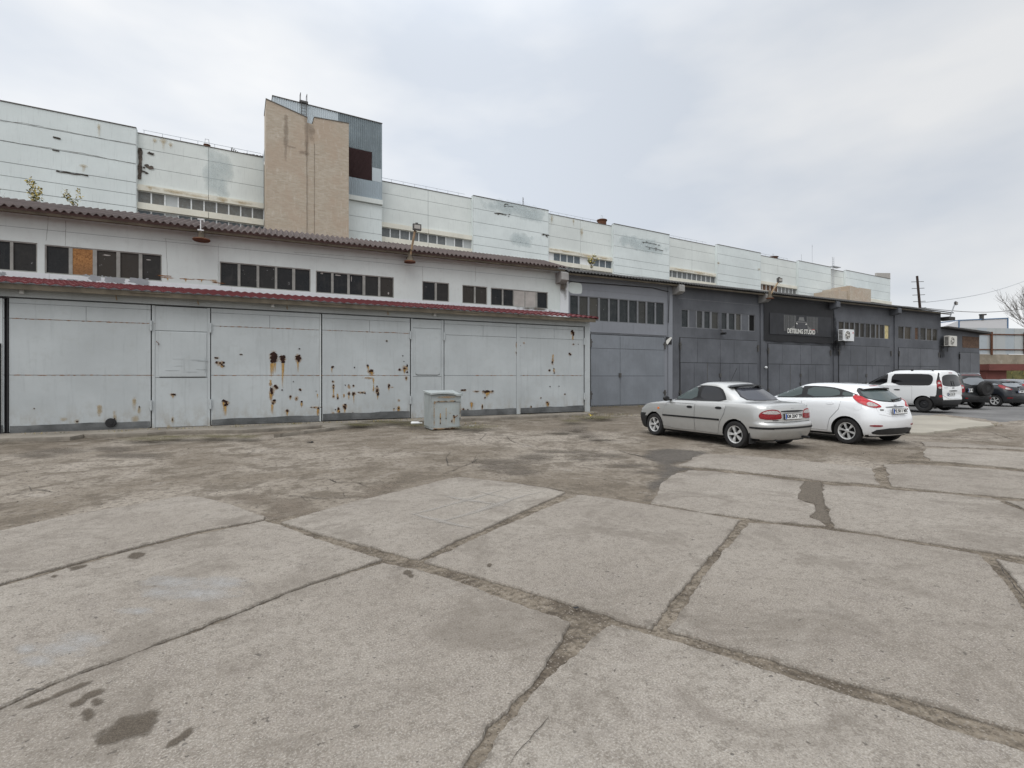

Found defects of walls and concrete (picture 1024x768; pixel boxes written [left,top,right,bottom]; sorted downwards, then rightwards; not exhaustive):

spalling [138,148,154,179]
corrosion [269,348,408,415]
corrosion [434,389,494,430]
spalling [798,480,831,524]